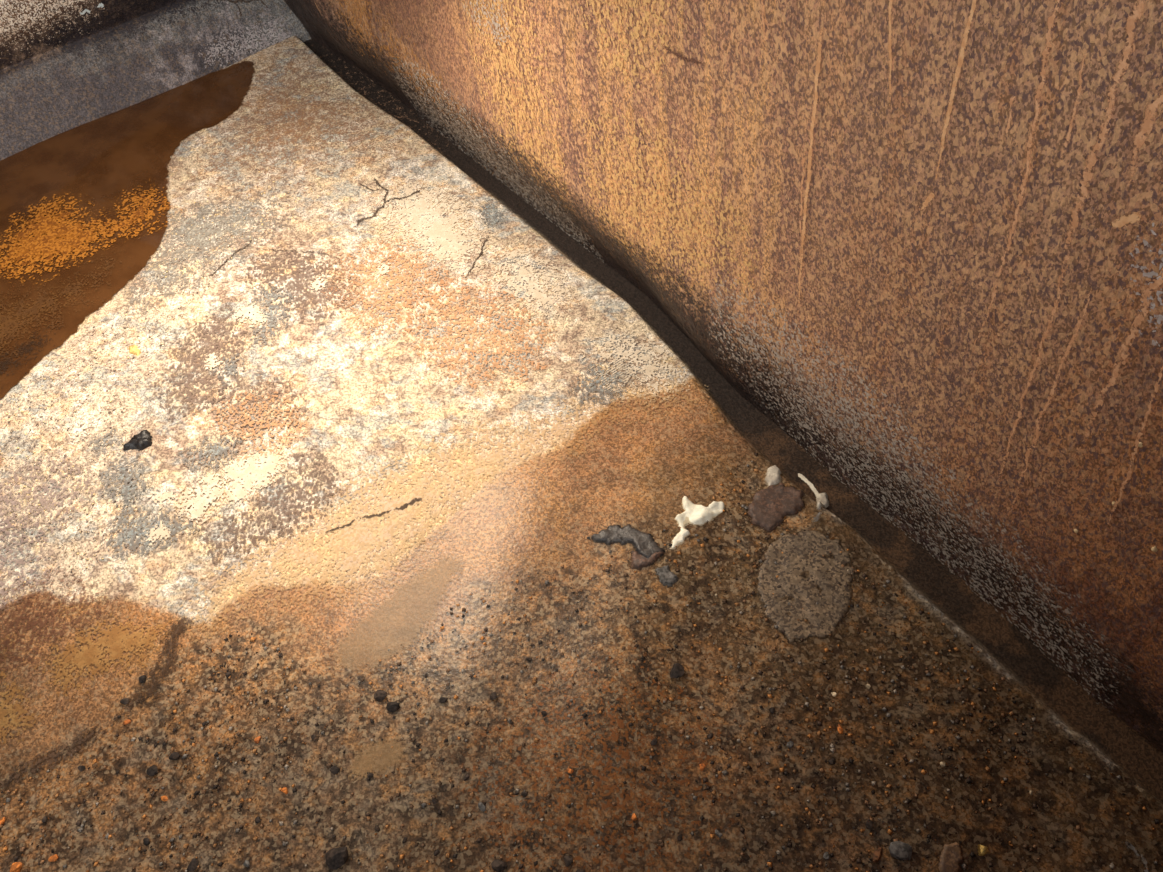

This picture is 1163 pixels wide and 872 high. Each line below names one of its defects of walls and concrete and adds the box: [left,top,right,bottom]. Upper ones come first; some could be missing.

damp [0,571,118,707]
damp [37,0,224,67]
crack [326,498,422,532]
rust [0,0,759,359]
damp [167,362,708,643]
crack [465,236,489,278]
damp [284,0,1163,752]
rust [797,26,823,313]
rust [921,0,977,210]
rust [969,0,1060,359]
rust [997,0,1144,511]
rust [1074,268,1163,457]